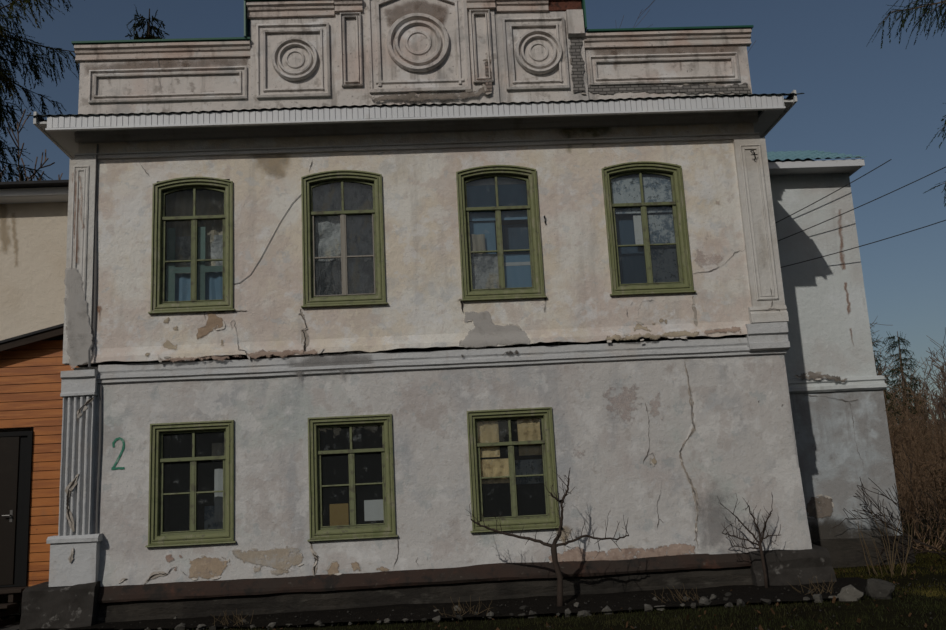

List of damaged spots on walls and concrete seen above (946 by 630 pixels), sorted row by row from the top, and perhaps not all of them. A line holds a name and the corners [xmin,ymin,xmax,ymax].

flaking render [569,37,752,94]
flaking render [145,312,324,362]
flaking render [795,371,847,382]
crack [643,404,662,526]
crack [679,362,699,548]
flaking render [806,494,834,518]
flaking render [165,546,318,580]
flaking render [326,561,342,575]
flaking render [549,543,695,563]